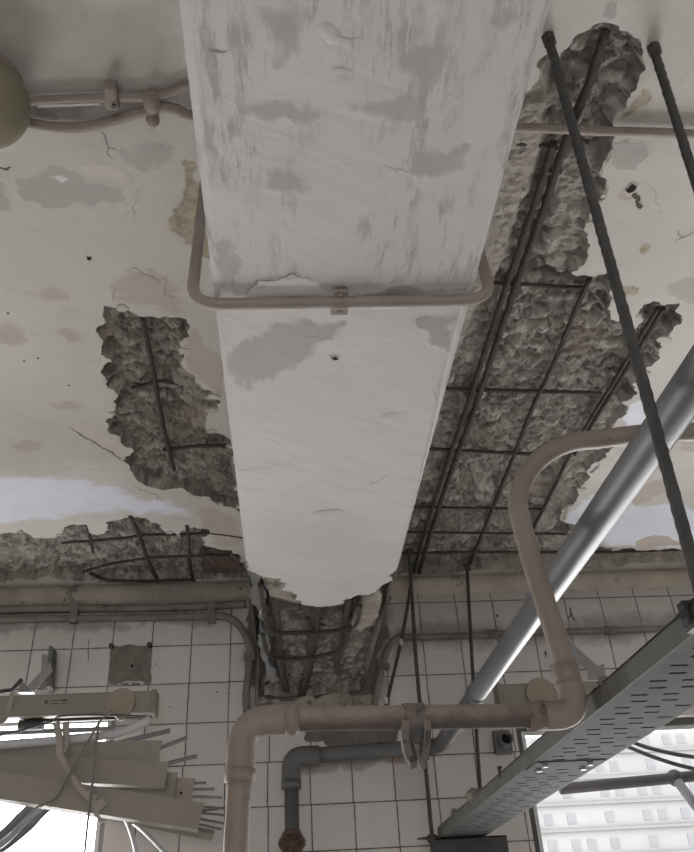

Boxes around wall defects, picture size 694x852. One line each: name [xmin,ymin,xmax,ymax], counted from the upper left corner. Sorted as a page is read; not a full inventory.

spalling [0,0,655,697]
spalling [635,274,694,376]
peeling [632,479,666,505]
spalling [581,535,685,570]